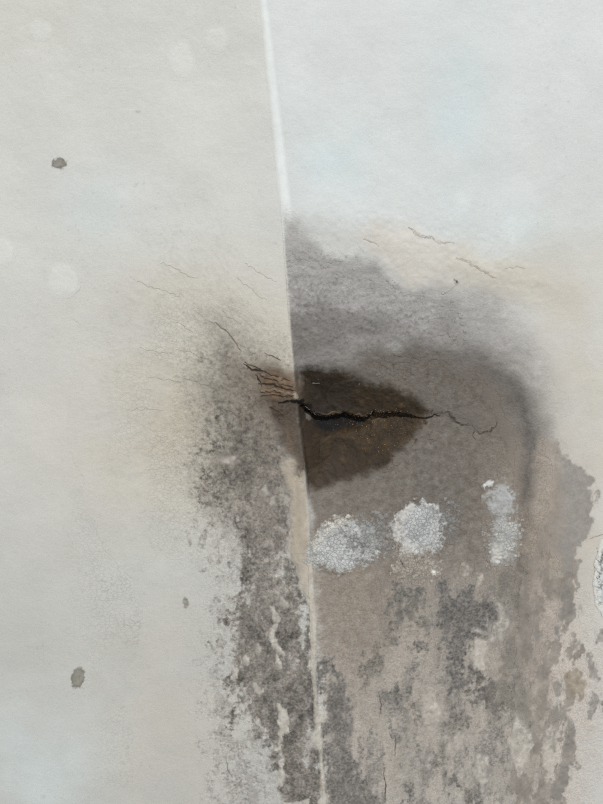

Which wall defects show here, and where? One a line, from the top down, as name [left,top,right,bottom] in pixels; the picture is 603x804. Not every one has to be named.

crack [167,310,498,437]
leakage [66,195,575,804]
leakage [577,482,603,617]